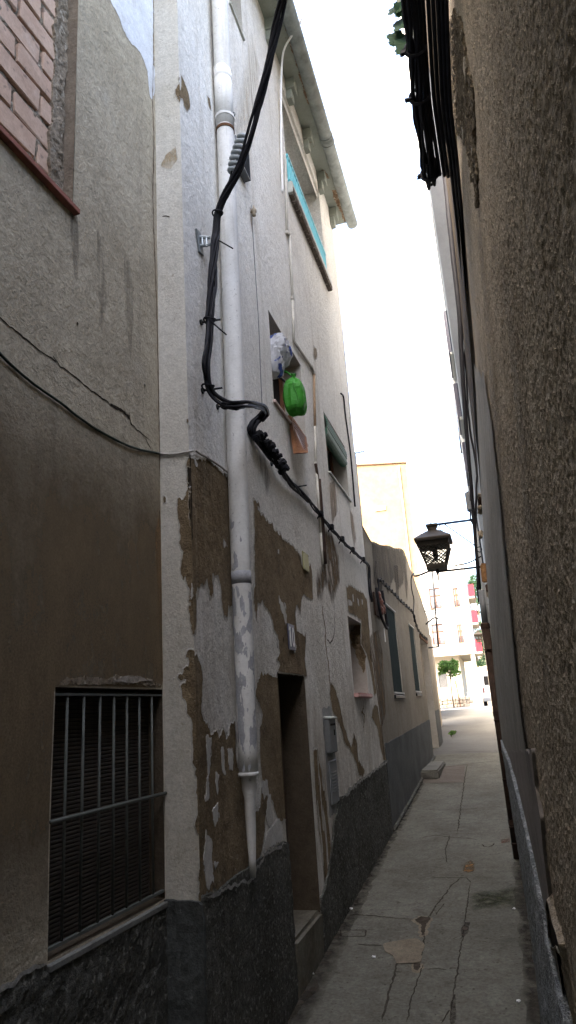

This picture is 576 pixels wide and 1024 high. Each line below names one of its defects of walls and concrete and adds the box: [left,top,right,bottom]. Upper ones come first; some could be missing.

peeling [111,0,155,99]
peeling [174,74,190,113]
crack [0,0,170,470]
peeling [163,454,313,901]
peeling [329,680,365,778]
peeling [346,583,387,762]
crack [357,751,494,1023]